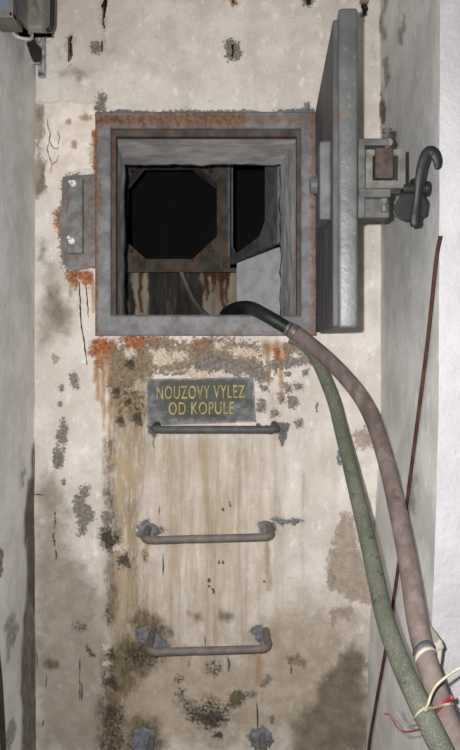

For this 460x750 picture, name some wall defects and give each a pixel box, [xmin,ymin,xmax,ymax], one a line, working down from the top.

hole [222,37,244,63]
crack [37,119,60,188]
corrosion [66,270,94,309]
crack [78,281,89,365]
corrosion [89,336,161,416]
corrosion [264,342,289,395]
peeling [52,417,69,471]
peeling [72,483,95,537]
water stain [21,358,368,750]